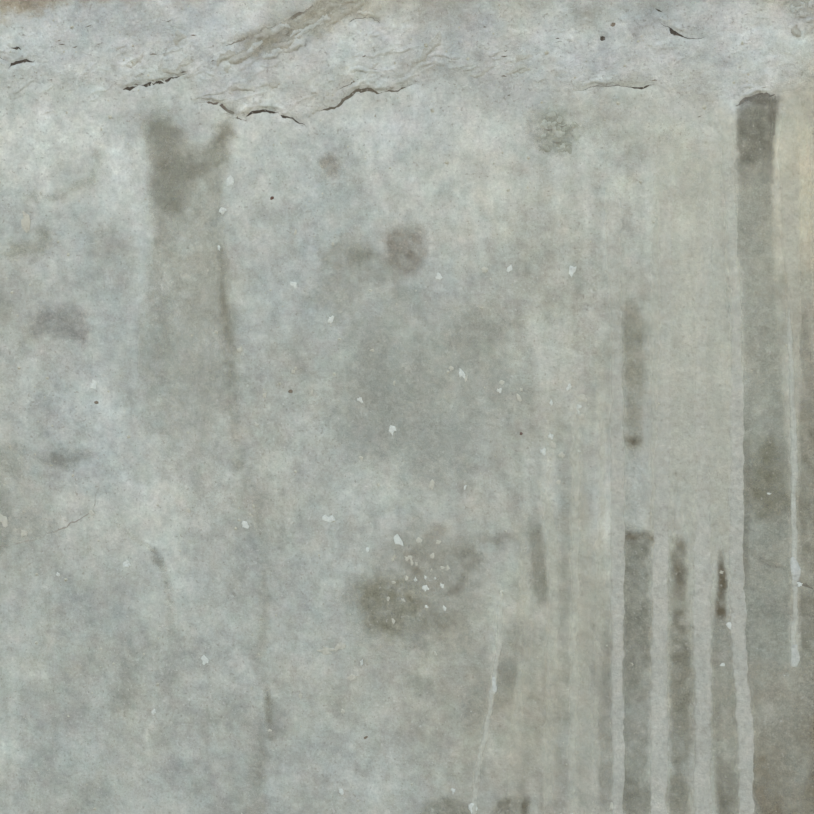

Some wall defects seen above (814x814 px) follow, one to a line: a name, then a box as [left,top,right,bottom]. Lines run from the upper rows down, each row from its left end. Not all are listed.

spalling [217,0,370,66]
leakage [148,118,237,413]
leakage [341,518,486,651]
leakage [494,798,531,814]
leakage [529,532,548,603]
leakage [623,527,654,814]
leakage [668,538,692,814]
leakage [713,551,739,814]
leakage [737,96,814,814]